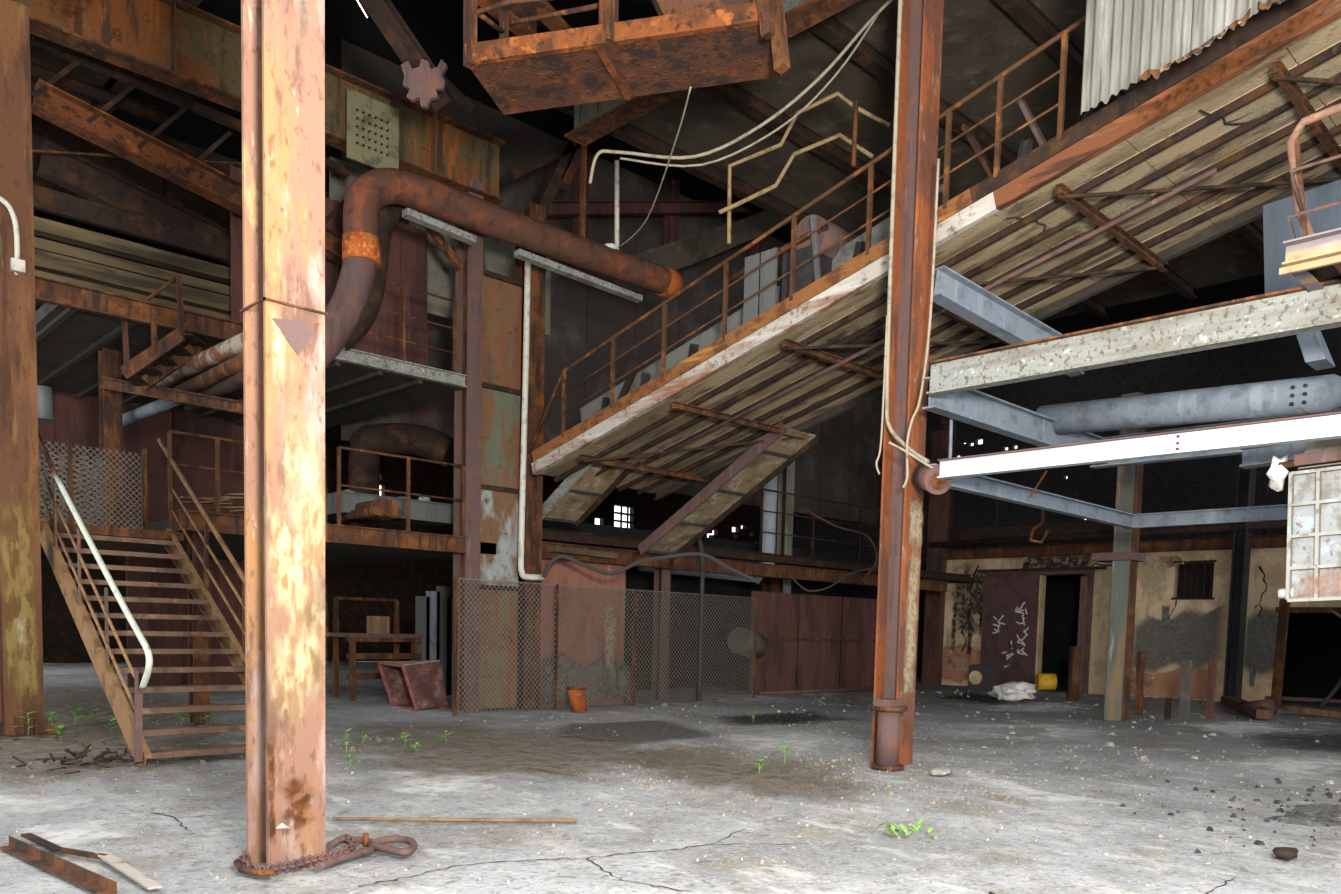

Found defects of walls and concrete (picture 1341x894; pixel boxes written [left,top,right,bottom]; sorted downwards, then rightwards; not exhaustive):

water stain [1131,561,1220,699]
rust [267,743,310,837]
water stain [365,690,859,796]